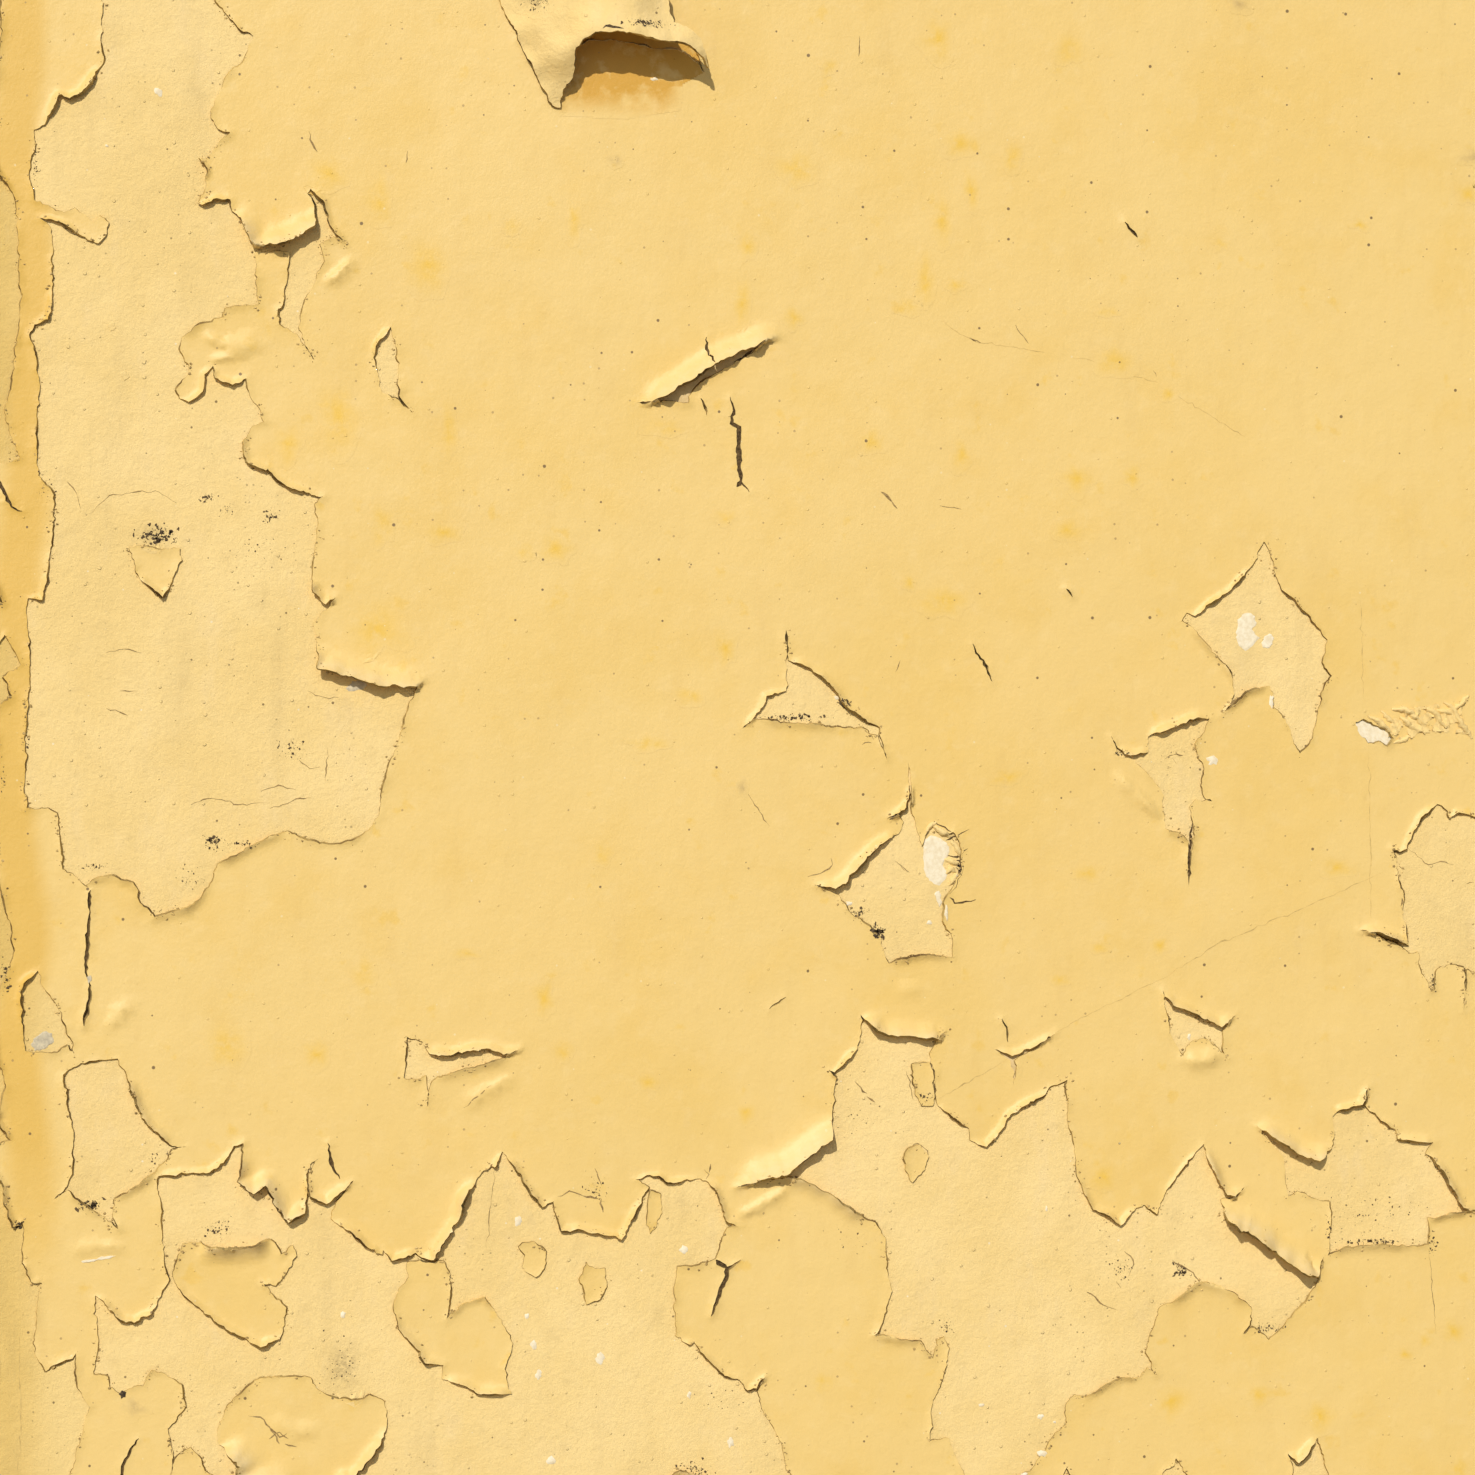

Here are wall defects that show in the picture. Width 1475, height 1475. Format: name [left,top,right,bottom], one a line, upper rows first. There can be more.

peeling [499,0,709,119]
crack [705,339,752,362]
peeling [0,0,428,922]
crack [730,400,748,490]
peeling [743,629,883,747]
peeling [1116,542,1338,851]
peeling [1356,695,1473,745]
peeling [815,769,967,965]
peeling [1361,805,1475,1004]
peeling [0,887,1475,1475]
crack [715,1260,736,1304]